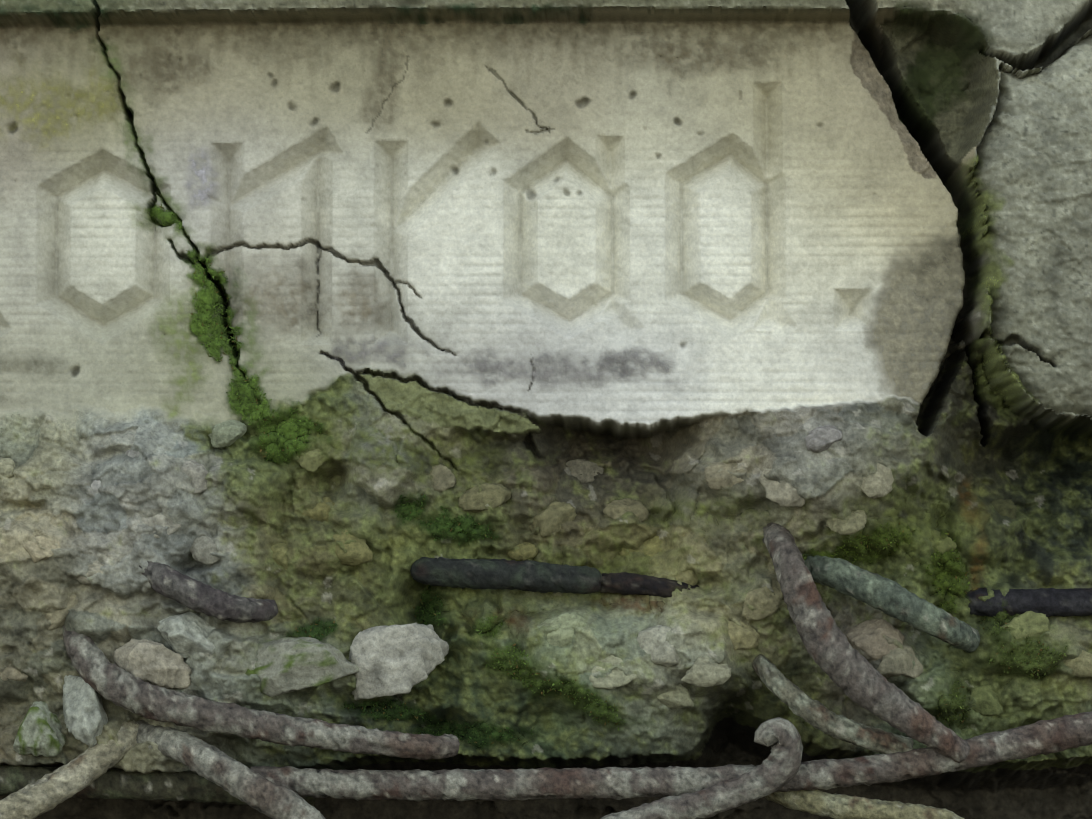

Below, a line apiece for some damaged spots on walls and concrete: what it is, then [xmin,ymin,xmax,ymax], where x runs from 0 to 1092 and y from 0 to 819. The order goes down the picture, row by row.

crack [95,5,536,472]
crack [486,66,556,135]
crack [845,0,1057,447]
crack [979,0,1092,72]
spalling [0,339,1092,819]